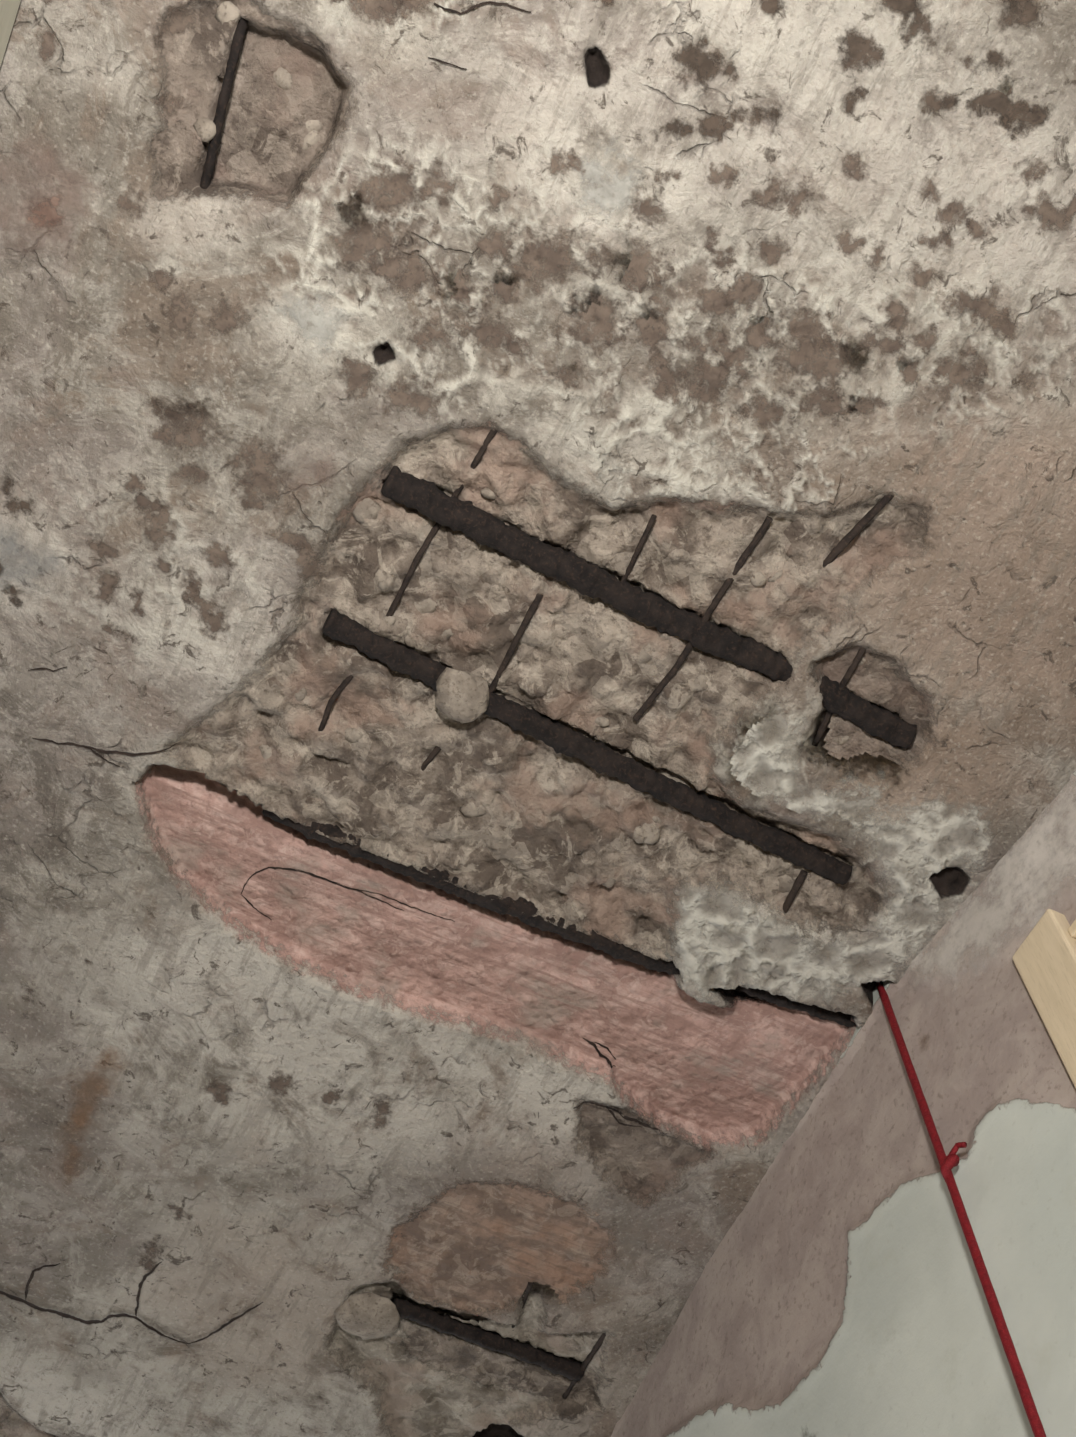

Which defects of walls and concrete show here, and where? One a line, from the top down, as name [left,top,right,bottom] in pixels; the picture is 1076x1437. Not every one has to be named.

spalling [116,0,357,218]
peeling [333,157,456,295]
peeling [548,149,586,175]
peeling [148,397,210,483]
peeling [338,357,446,416]
peeling [87,540,144,617]
peeling [125,473,237,640]
spalling [166,420,936,975]
spalling [571,1099,713,1208]
peeling [611,871,1076,1437]
crack [0,1262,263,1344]
spalling [324,1180,616,1437]